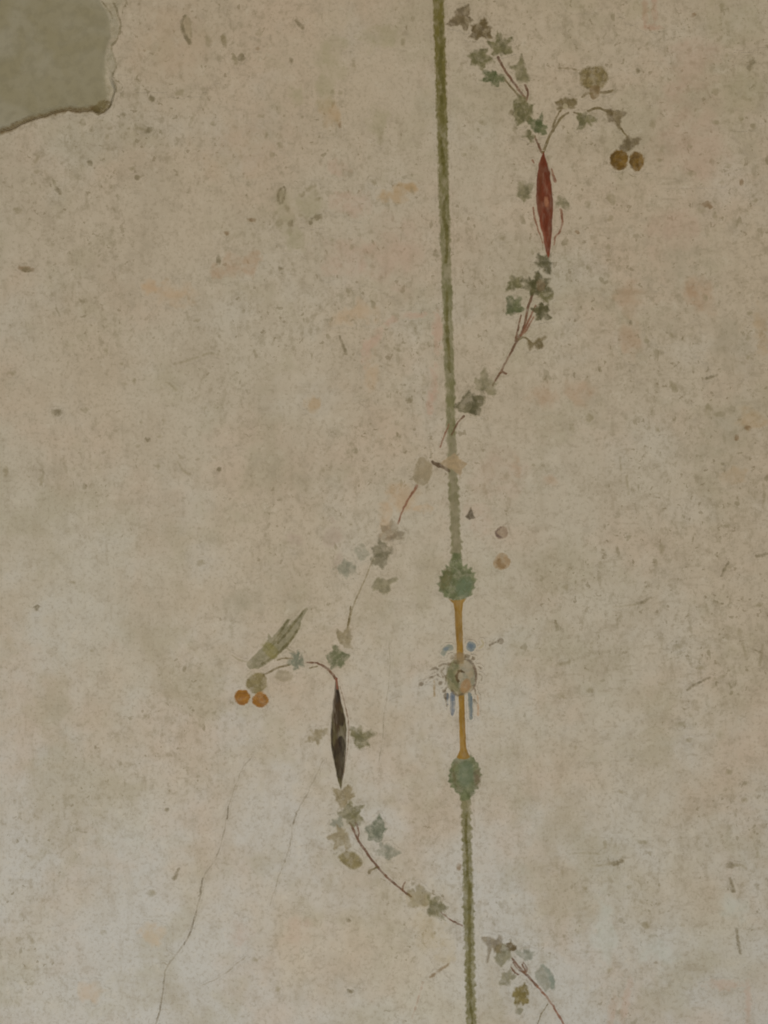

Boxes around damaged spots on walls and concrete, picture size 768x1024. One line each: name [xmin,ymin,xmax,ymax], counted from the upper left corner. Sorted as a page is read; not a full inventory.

crack [153,755,254,1024]